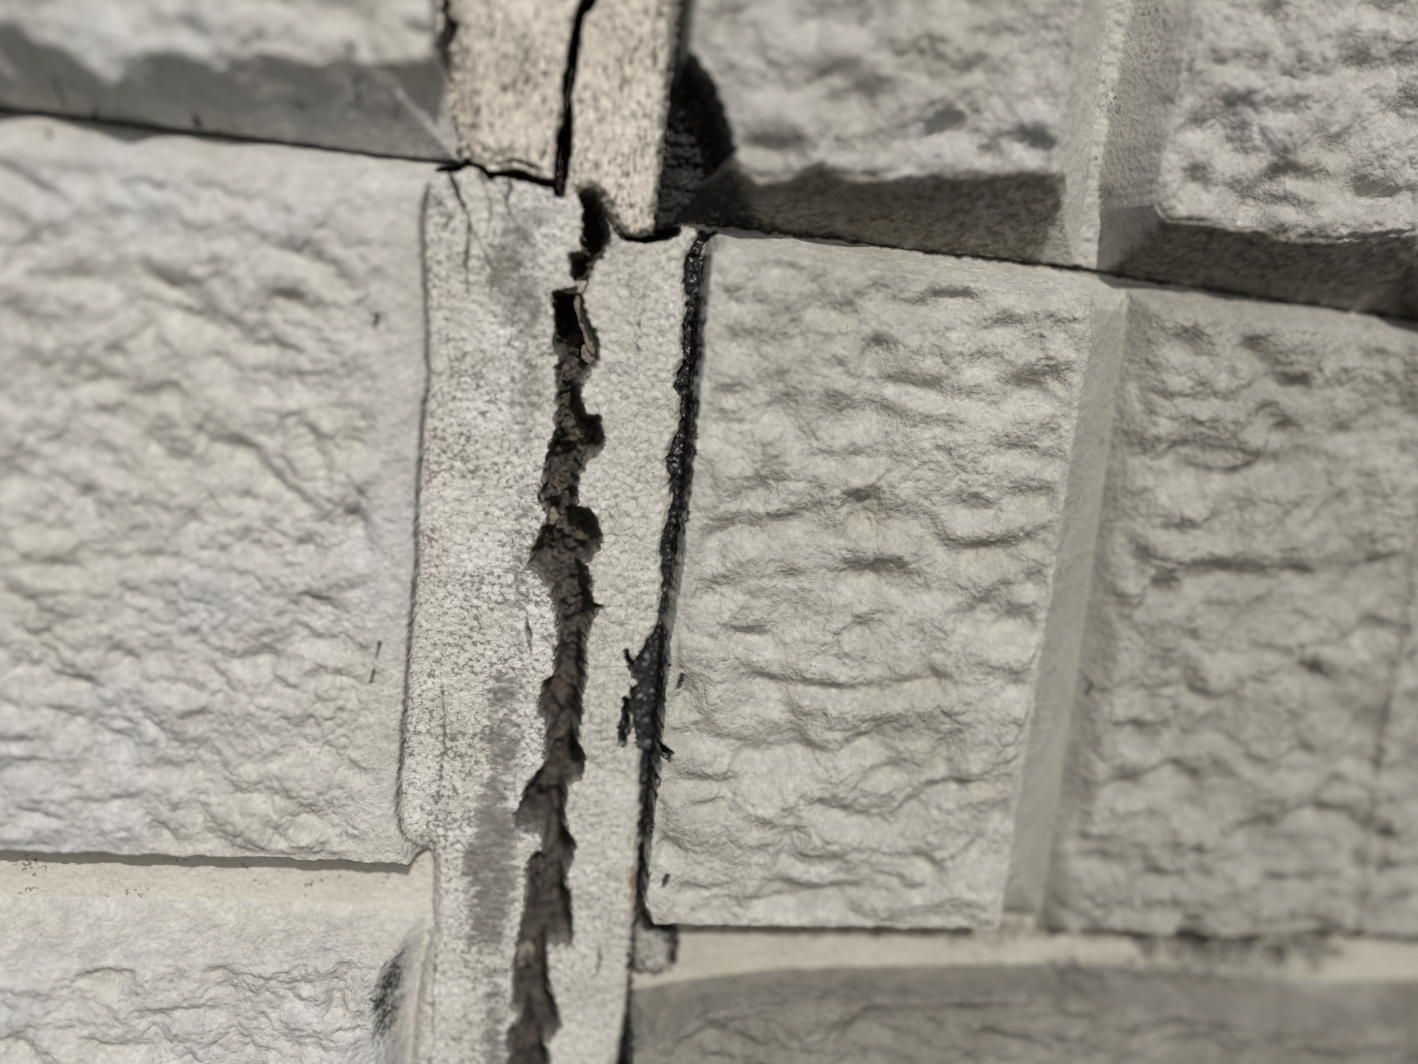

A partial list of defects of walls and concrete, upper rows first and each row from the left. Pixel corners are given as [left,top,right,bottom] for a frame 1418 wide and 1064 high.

crack [420,0,681,1064]